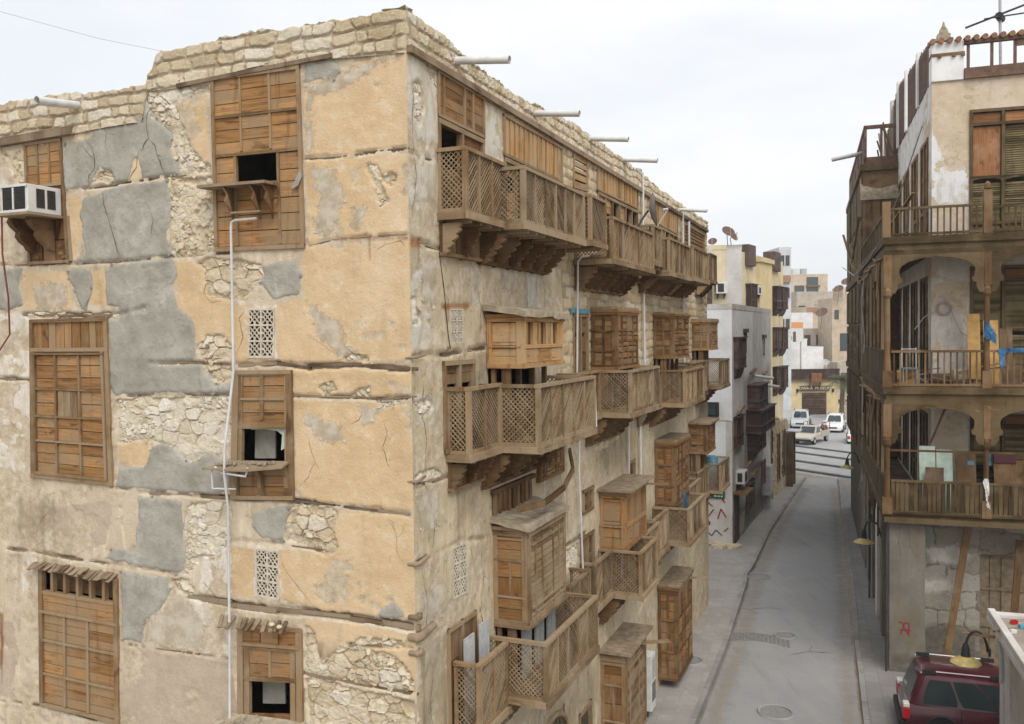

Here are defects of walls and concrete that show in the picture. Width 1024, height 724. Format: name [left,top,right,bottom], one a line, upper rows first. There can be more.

crack [129,99,163,179]
spalling [148,82,265,301]
spalling [115,335,232,462]
spalling [168,500,232,596]
spalling [280,503,338,556]
peeling [925,579,955,593]
peeling [925,543,972,566]
spalling [305,626,415,693]